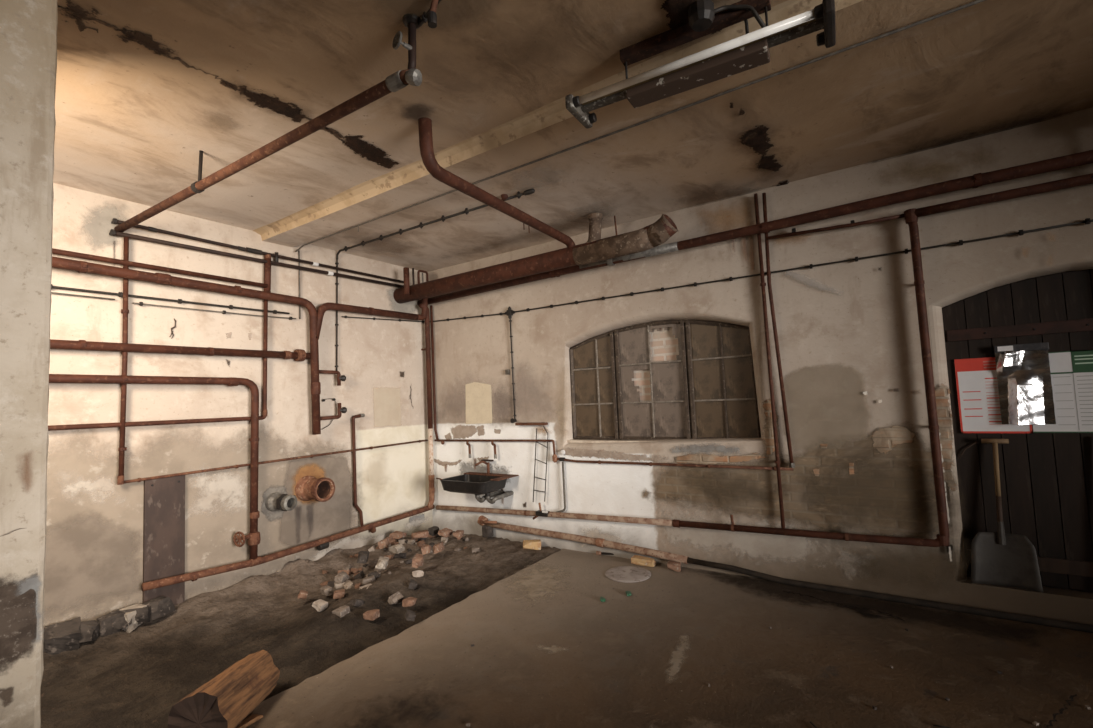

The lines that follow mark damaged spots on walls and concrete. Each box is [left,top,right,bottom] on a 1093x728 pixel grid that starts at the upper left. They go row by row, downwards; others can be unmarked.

crack [58,0,274,105]
crack [299,114,345,139]
spalling [739,125,789,186]
leakage [784,366,870,449]
spalling [562,384,957,537]
leakage [44,429,357,626]
peeling [0,574,41,671]
peeling [0,687,13,707]